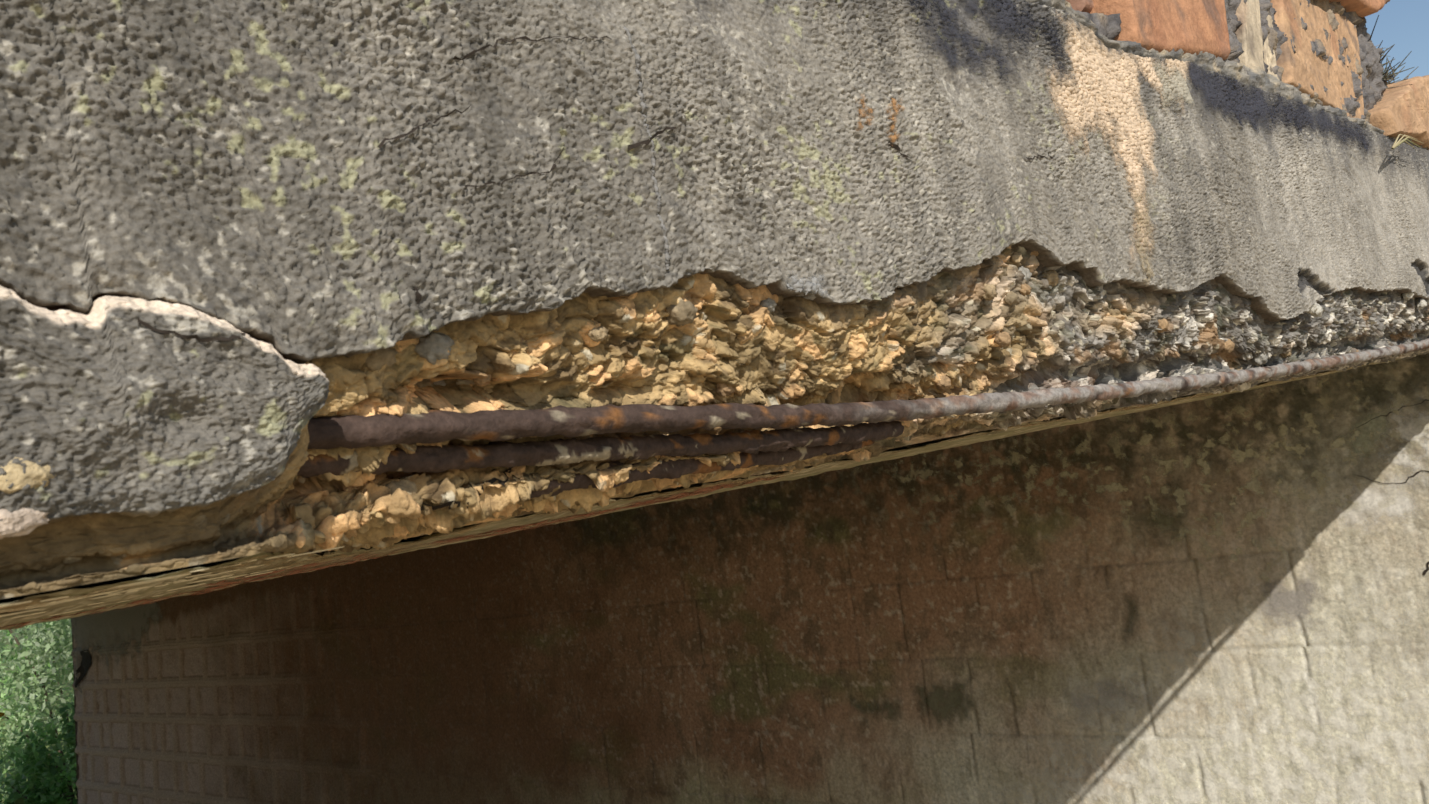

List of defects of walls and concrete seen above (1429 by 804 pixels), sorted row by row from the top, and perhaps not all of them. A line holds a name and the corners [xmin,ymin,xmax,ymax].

spalling [0,244,1429,619]
crack [1357,470,1429,484]
water stain [1051,582,1429,804]